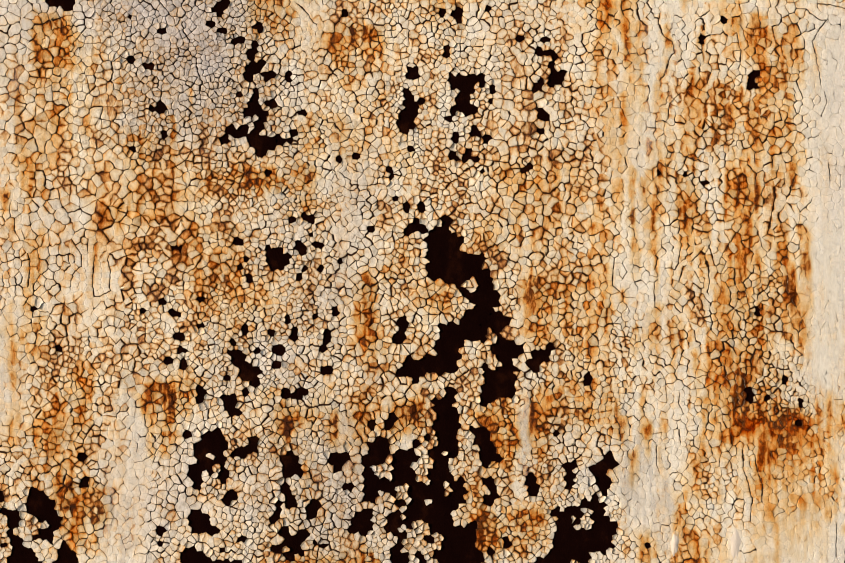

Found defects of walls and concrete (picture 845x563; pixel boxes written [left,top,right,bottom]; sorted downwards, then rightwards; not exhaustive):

peeling [201,0,306,183]
crack [645,82,691,141]
rust [725,159,760,280]
rust [783,253,810,325]
rust [142,383,193,446]
peeling [158,295,342,506]
peeling [324,196,560,563]
peeling [535,451,623,563]
crack [596,489,672,563]
crack [648,432,688,491]
rust [706,350,810,482]
crack [793,431,838,504]